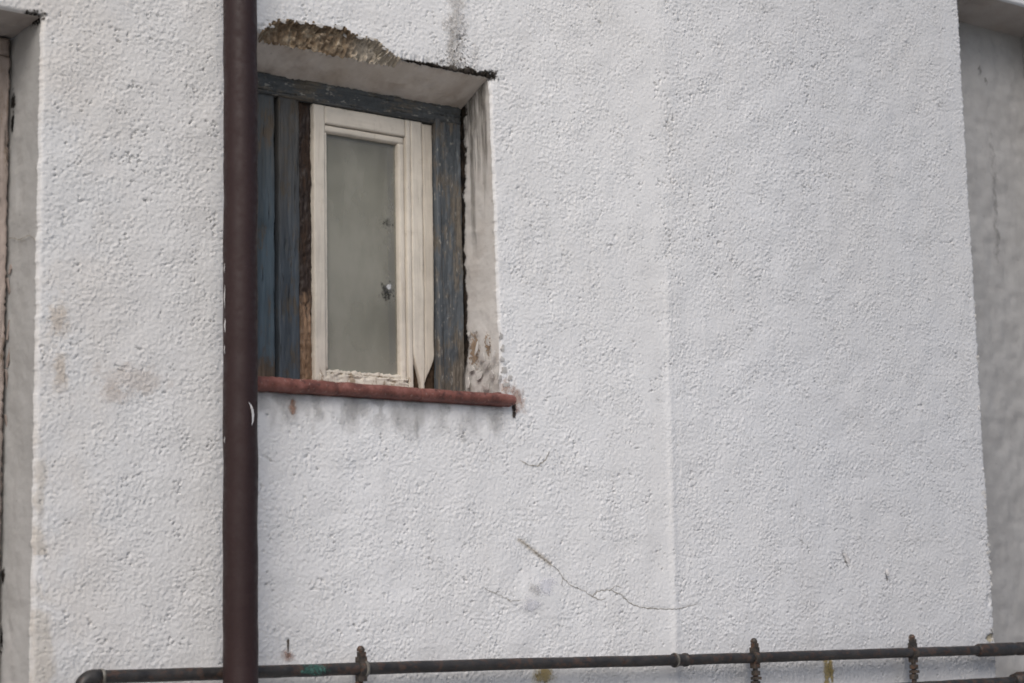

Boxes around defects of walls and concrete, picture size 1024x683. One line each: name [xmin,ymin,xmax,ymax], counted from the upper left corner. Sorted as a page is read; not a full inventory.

spalling [258,18,402,68]
damp [402,31,498,367]
peeling [466,330,512,394]
crack [523,543,696,610]